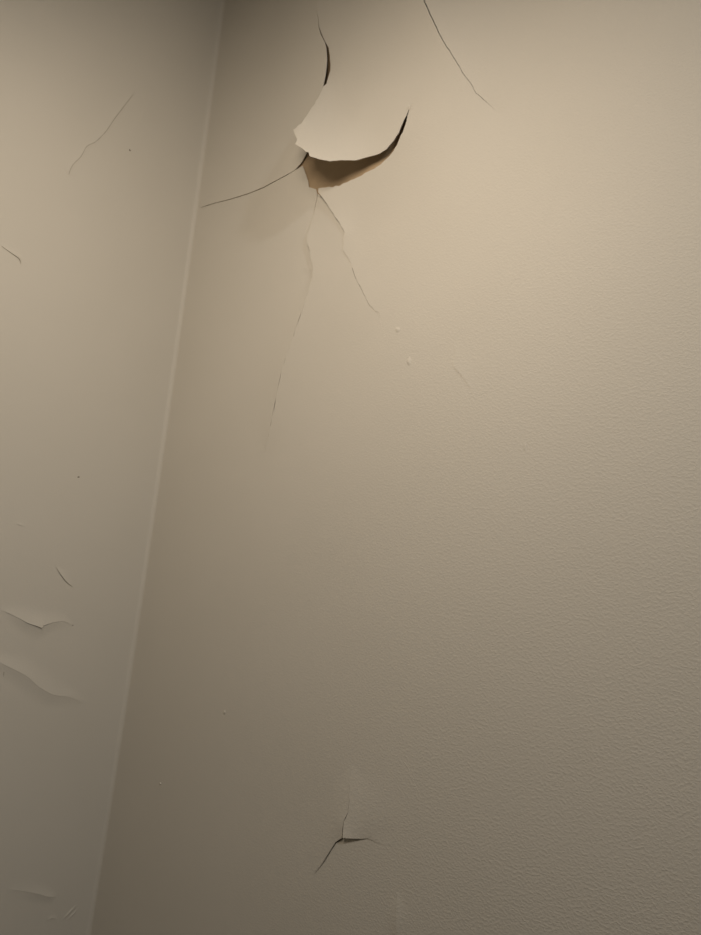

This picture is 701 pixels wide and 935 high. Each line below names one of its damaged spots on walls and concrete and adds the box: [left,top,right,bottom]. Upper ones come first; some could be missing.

peeling [201,0,573,506]